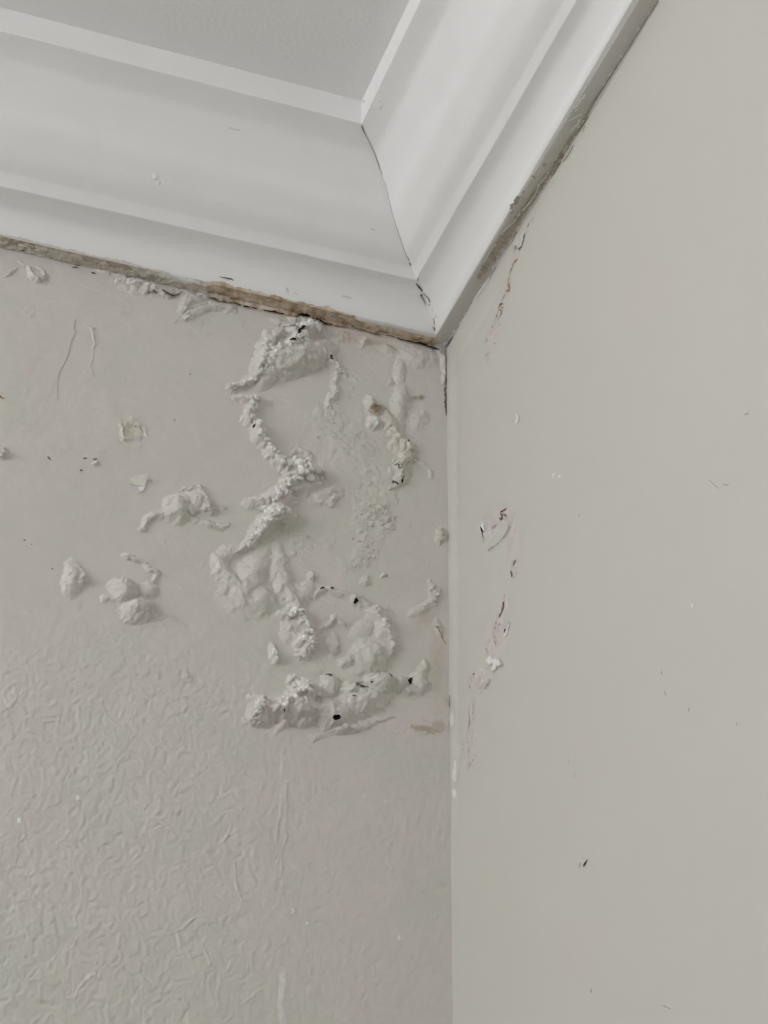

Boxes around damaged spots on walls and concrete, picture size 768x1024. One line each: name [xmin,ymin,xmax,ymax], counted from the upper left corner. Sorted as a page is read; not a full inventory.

peeling [0,0,659,349]
crack [361,125,452,416]
peeling [469,594,510,694]
peeling [480,506,519,577]